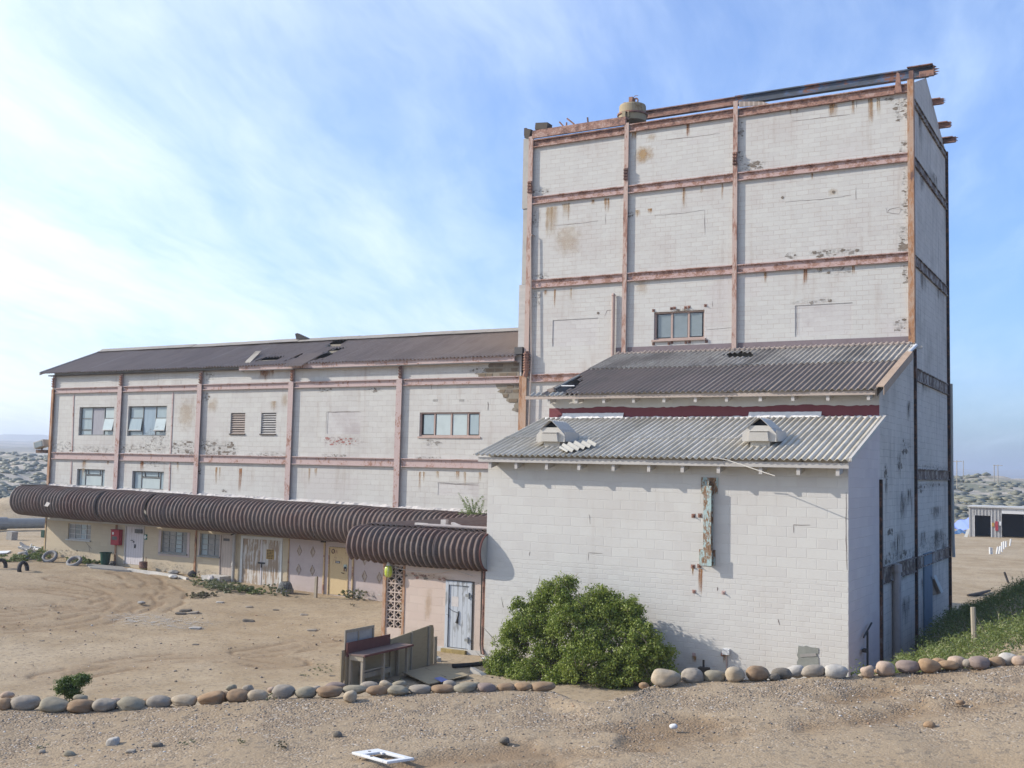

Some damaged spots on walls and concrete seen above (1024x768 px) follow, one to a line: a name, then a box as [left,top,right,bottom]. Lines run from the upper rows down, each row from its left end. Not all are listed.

peeling [123,429,236,467]